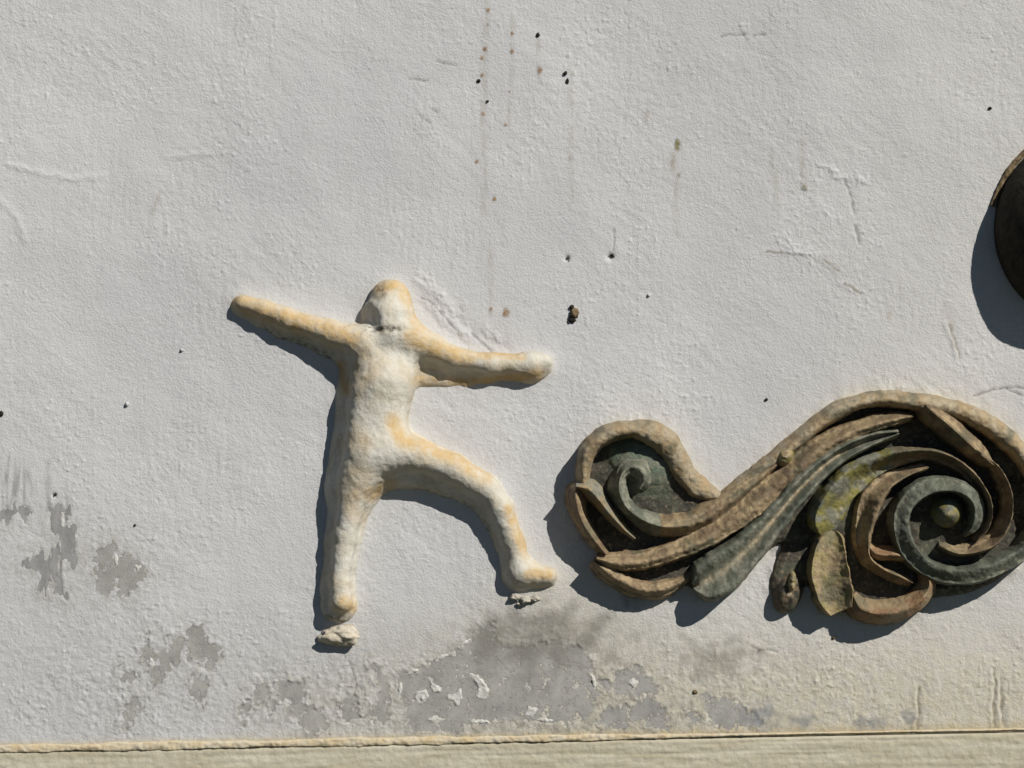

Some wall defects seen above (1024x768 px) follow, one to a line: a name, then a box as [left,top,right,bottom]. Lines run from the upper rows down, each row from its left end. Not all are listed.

peeling [22,503,78,600]
peeling [93,540,148,597]
peeling [122,697,145,729]
peeling [117,623,224,709]
peeling [337,623,672,737]